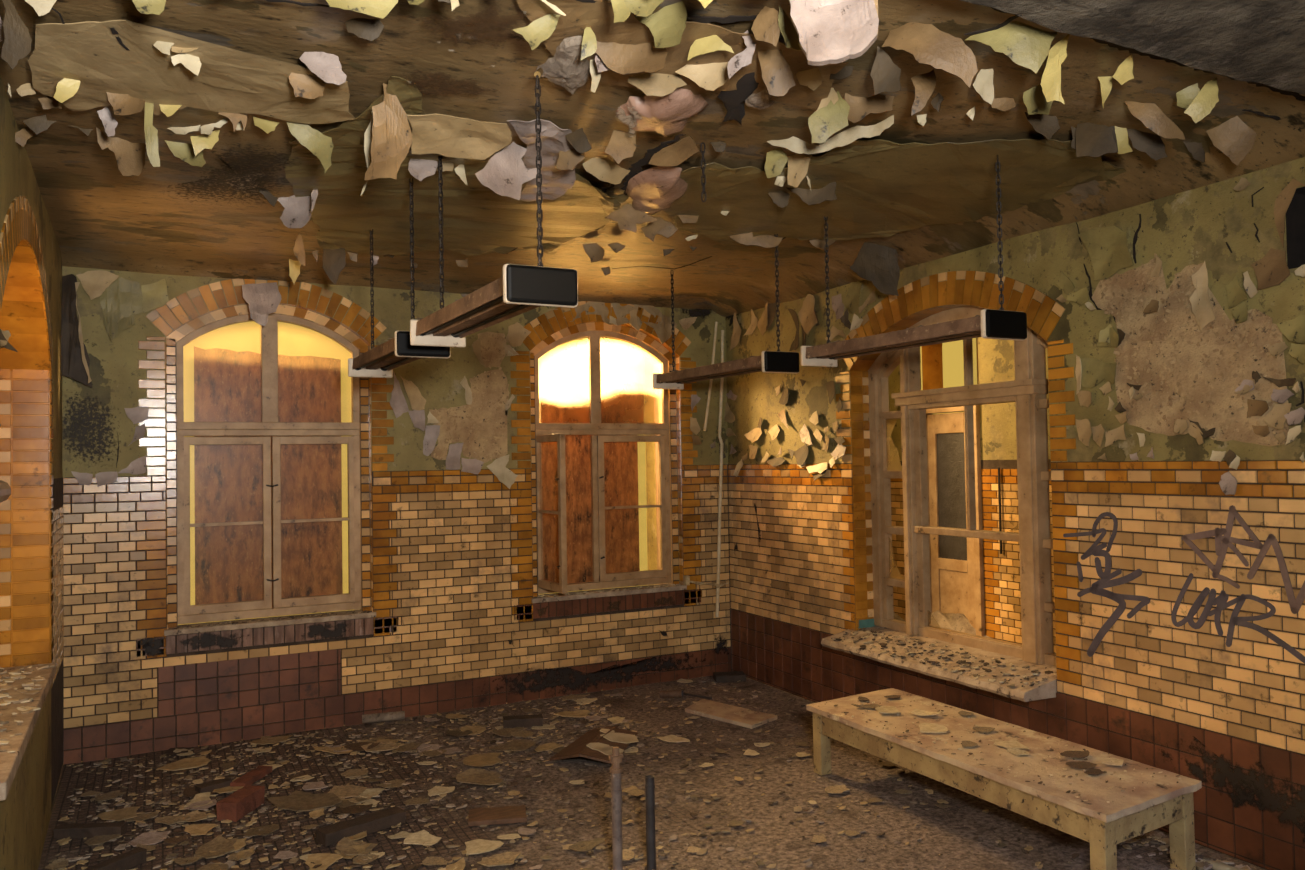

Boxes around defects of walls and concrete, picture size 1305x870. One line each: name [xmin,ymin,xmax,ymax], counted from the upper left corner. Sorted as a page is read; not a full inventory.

mould [167,140,301,209]
peeling [0,0,1256,352]
peeling [1056,178,1305,495]
water stain [62,384,119,467]
flaking render [390,322,531,489]
peeling [690,379,846,481]
water stain [1162,737,1305,843]